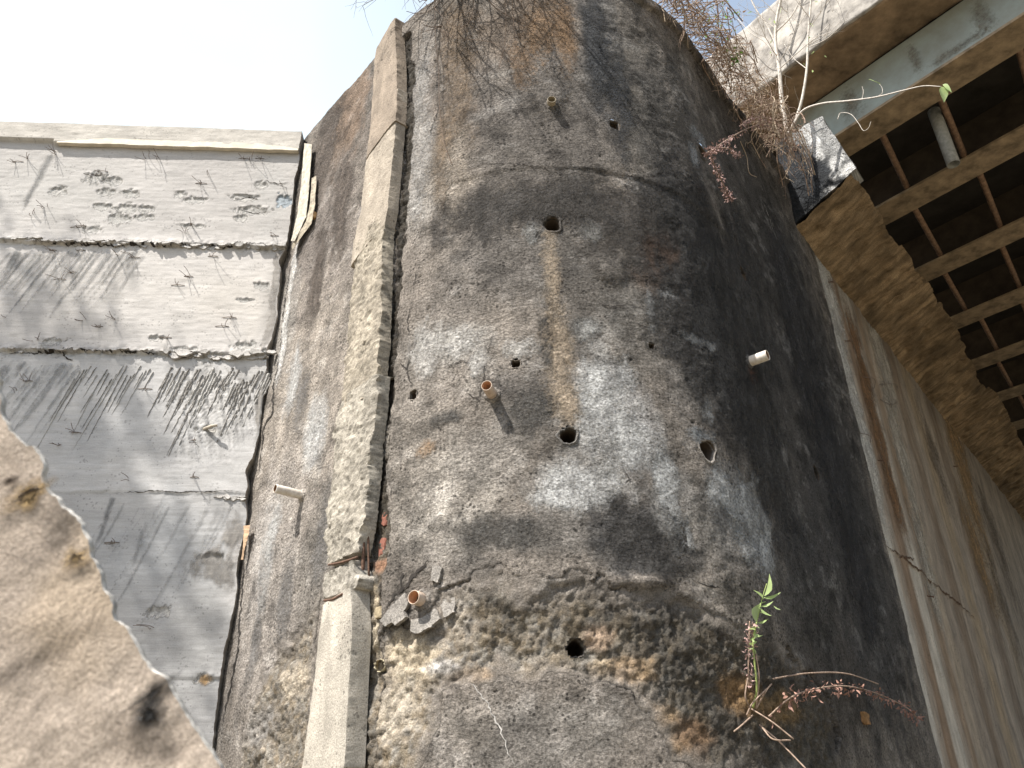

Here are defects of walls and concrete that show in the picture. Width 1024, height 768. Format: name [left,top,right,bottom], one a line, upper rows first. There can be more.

water stain [582,1,632,162]
spalling [10,170,287,251]
spalling [7,334,278,365]
water stain [410,316,486,376]
spalling [230,35,841,768]
water stain [431,163,882,643]
crack [386,558,429,612]
crack [888,547,975,619]
crack [473,684,515,765]